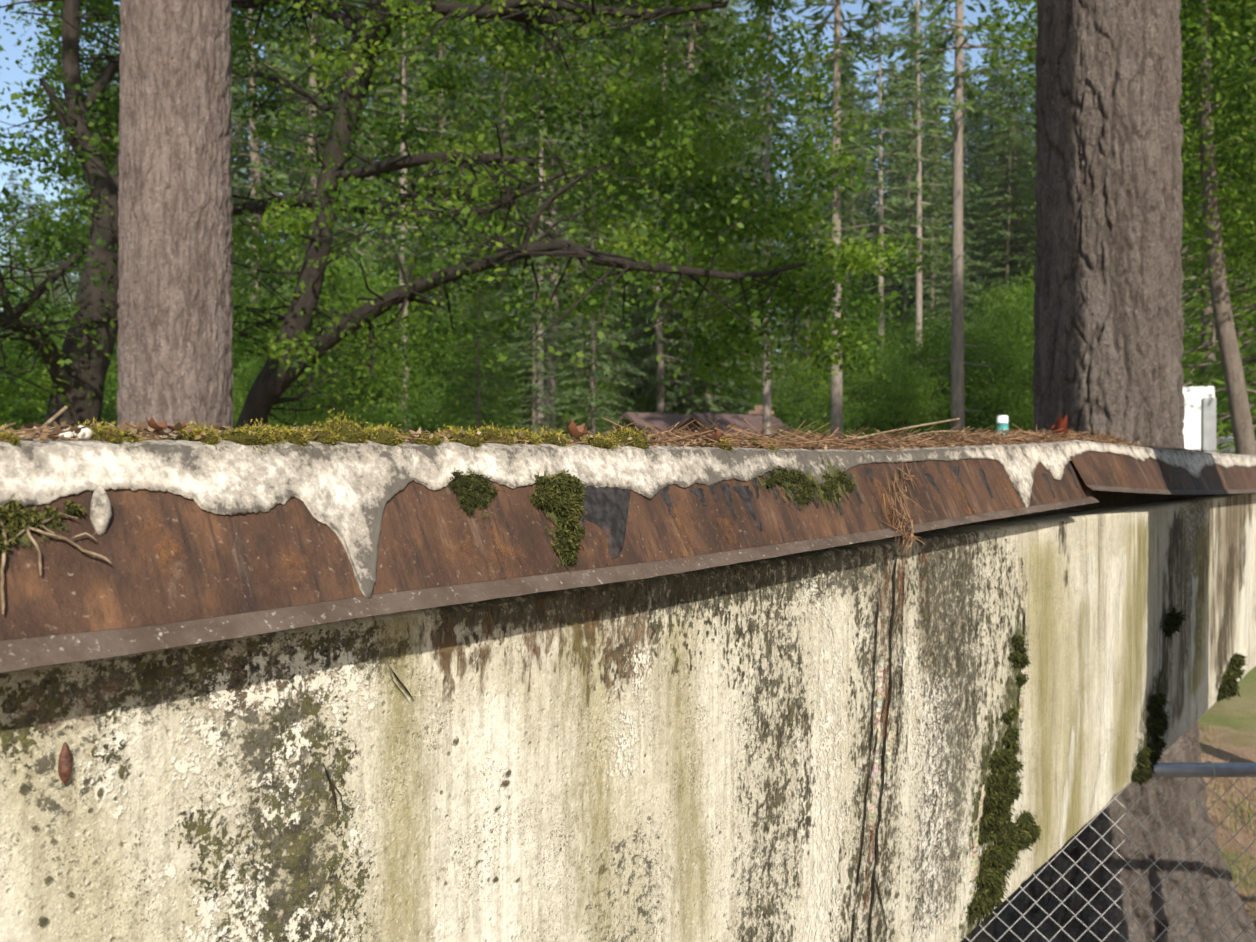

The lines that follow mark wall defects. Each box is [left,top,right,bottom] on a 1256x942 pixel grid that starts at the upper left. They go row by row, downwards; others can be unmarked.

corrosion [223,641,299,709]
water stain [0,530,1027,942]
crack [852,554,905,942]
corrosion [880,548,906,735]
water stain [1056,521,1069,586]
water stain [1152,494,1252,728]